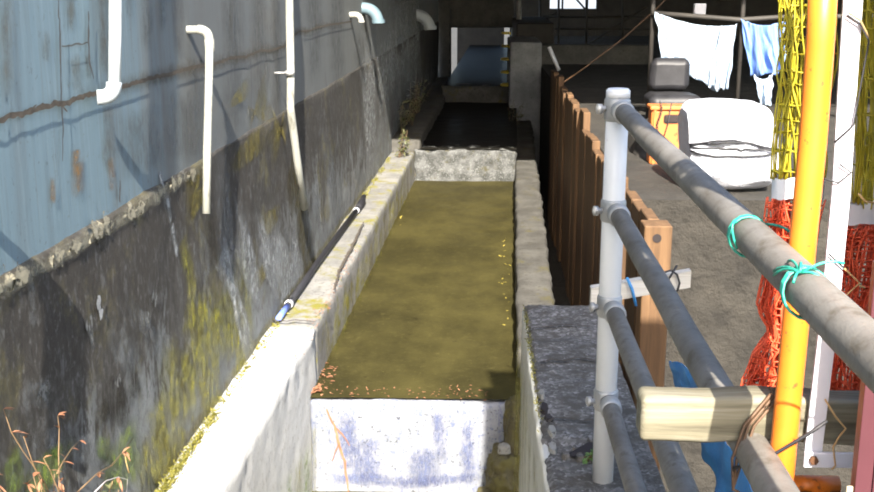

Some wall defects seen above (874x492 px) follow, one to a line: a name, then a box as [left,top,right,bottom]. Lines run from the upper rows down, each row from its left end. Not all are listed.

crack [0,0,97,161]
crack [122,20,352,89]
spalling [0,166,203,294]
leakage [339,415,472,486]